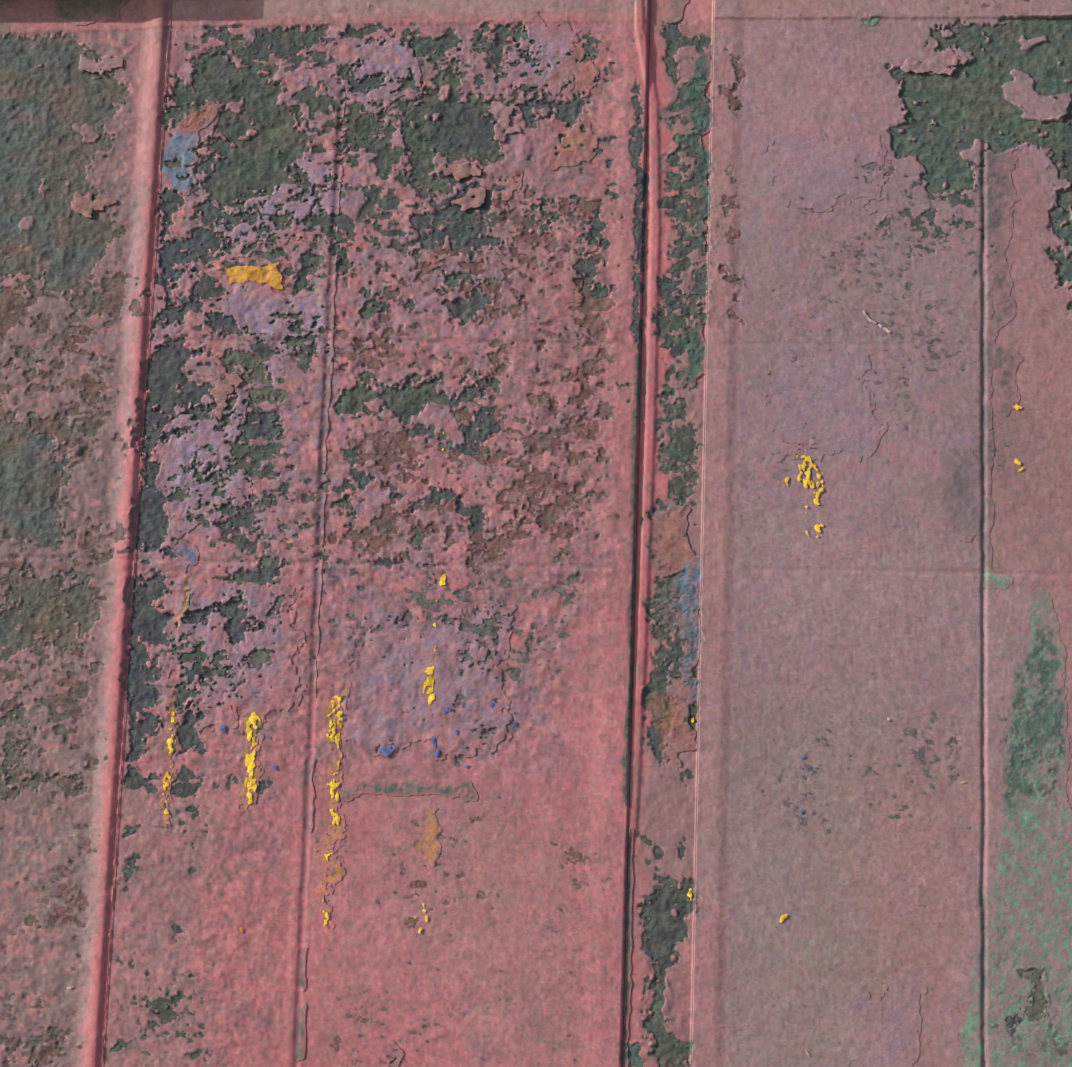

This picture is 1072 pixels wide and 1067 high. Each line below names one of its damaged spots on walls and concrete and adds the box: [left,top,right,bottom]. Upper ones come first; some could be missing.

peeling [822,17,1072,371]
peeling [0,22,746,845]
peeling [901,712,961,795]
peeling [0,824,100,954]
peeling [119,853,141,892]
peeling [393,854,449,914]
peeling [551,842,597,869]
peeling [628,836,695,1067]
peeling [0,989,83,1067]
peeling [112,974,212,1062]
peeling [1005,969,1047,1034]